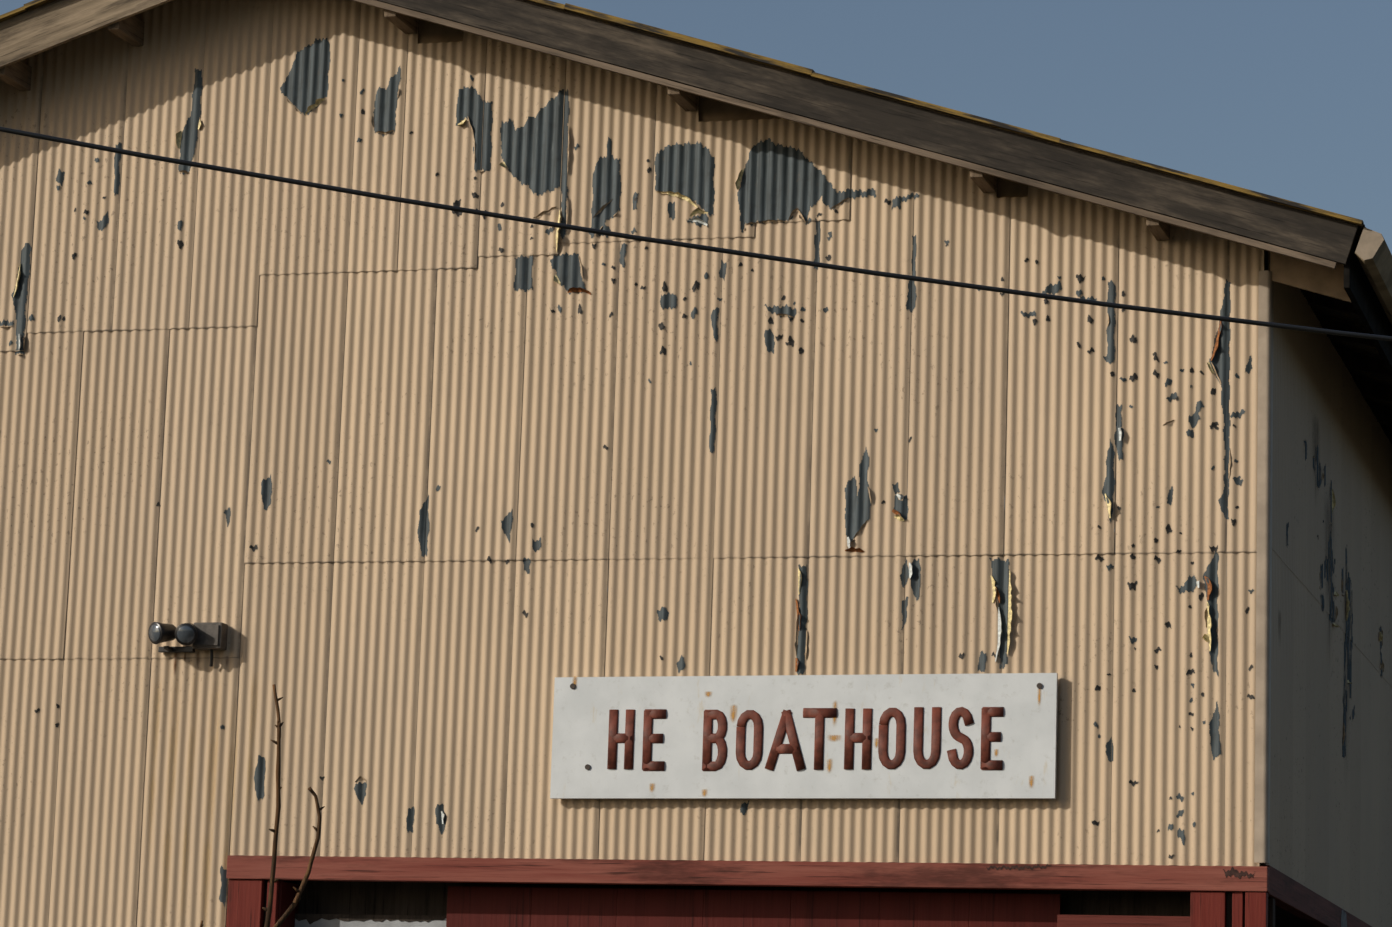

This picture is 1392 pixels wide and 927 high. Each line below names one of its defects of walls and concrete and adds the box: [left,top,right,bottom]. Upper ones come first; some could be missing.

peeling [176,68,203,175]
peeling [280,38,344,115]
peeling [356,66,413,142]
peeling [452,74,715,314]
peeling [735,138,919,270]
peeling [0,243,34,356]
peeling [634,260,753,355]
peeling [764,295,806,354]
peeling [845,448,908,552]
peeling [900,558,921,630]
peeling [958,557,1013,672]
peeling [1154,524,1219,676]